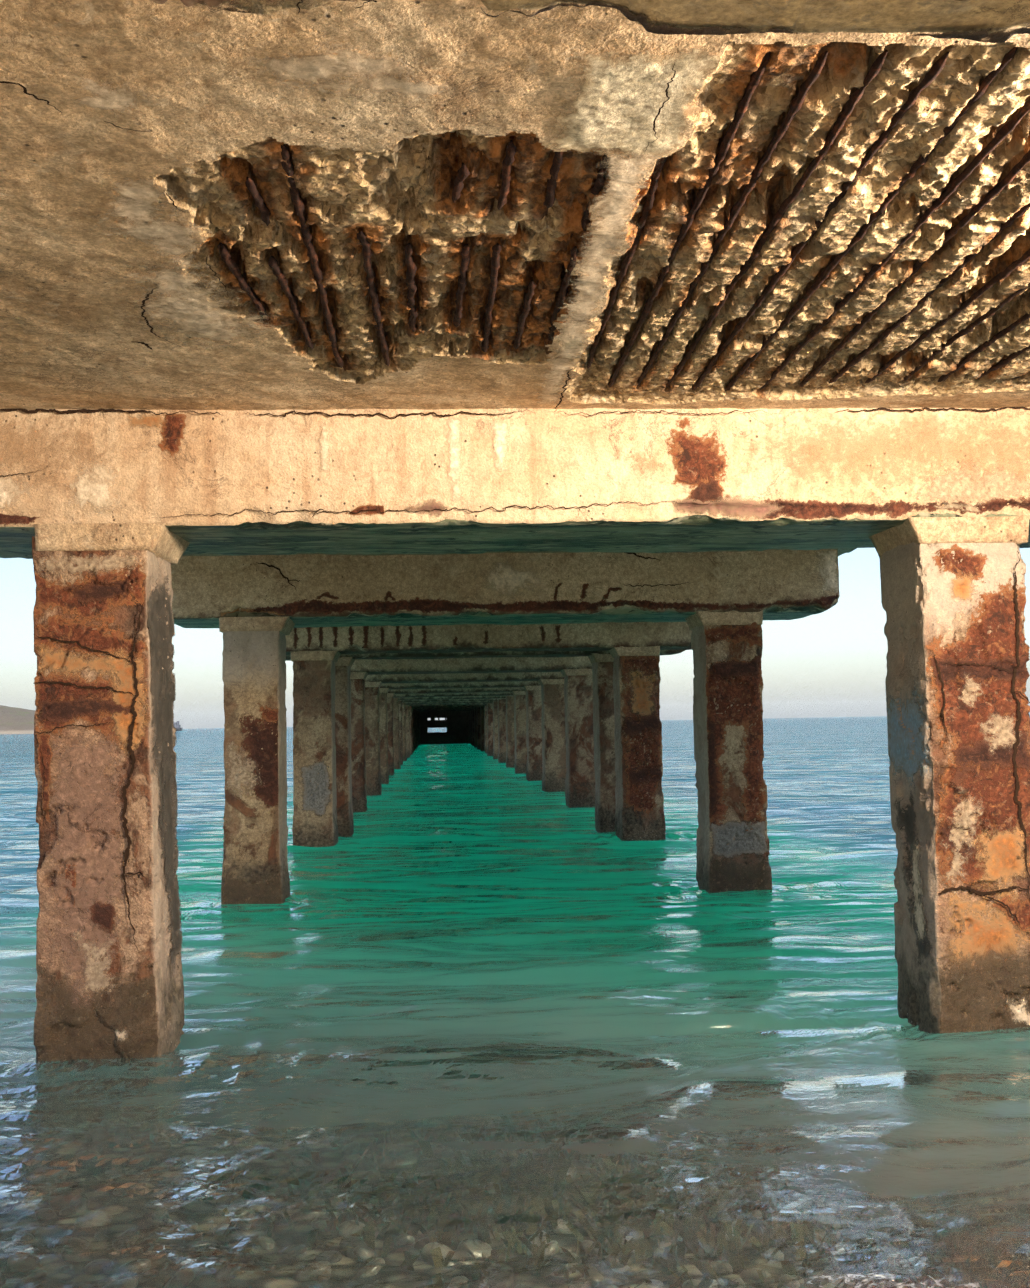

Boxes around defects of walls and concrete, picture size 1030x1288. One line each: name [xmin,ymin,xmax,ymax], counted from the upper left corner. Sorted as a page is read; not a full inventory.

spalling [98,130,621,384]
spalling [482,0,1030,405]
rust [129,414,187,456]
crack [0,368,783,419]
rust [667,414,784,519]
crack [33,602,144,951]
rust [64,861,116,933]
rust [34,555,151,823]
rust [225,703,278,814]
rust [705,622,767,832]
rust [925,544,1030,963]
crack [934,551,1030,931]